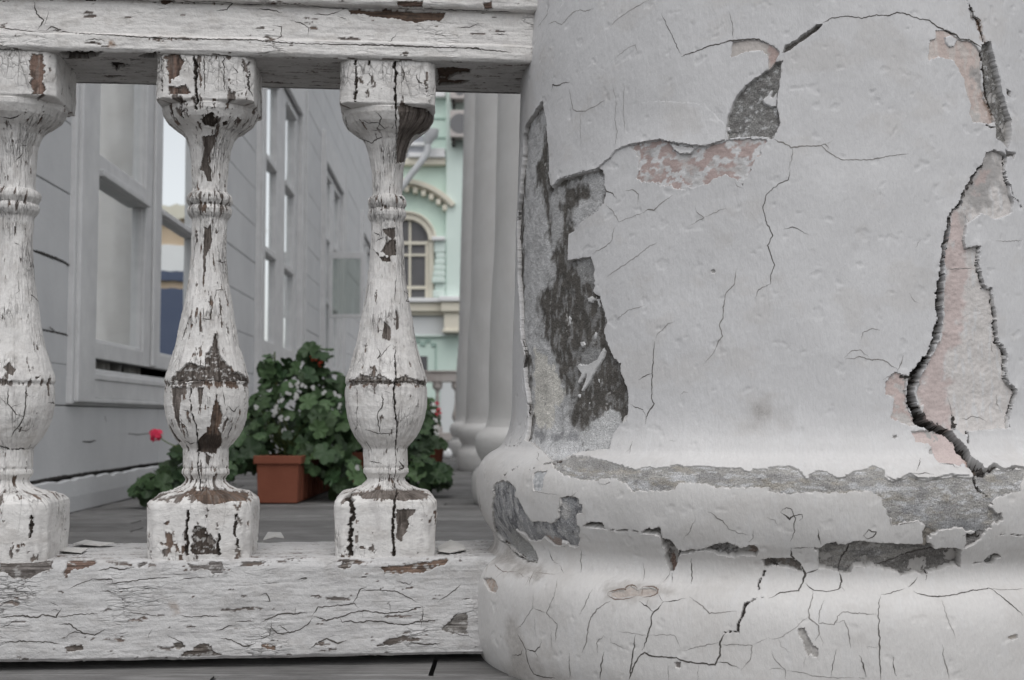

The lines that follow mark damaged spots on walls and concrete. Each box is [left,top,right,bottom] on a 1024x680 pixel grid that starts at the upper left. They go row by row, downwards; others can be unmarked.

crack [614,0,765,56]
crack [825,3,993,128]
peeling [396,104,433,163]
spalling [520,27,1024,573]
crack [706,139,909,361]
crack [844,157,1020,497]
peeling [170,334,248,466]
peeling [0,540,114,579]
crack [0,389,470,648]
peeling [359,490,427,542]
spalling [493,481,603,561]
crack [484,507,1023,680]